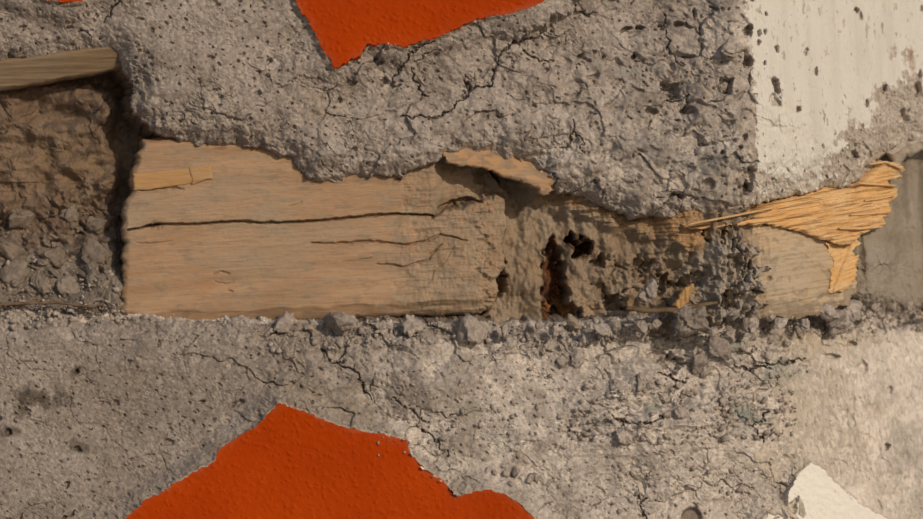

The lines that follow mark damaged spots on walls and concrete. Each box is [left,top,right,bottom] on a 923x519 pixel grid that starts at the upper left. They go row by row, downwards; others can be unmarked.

spalling [0,0,759,220]
crack [390,33,550,120]
crack [559,119,586,152]
peeling [752,70,923,207]
rust [541,233,595,320]
crack [320,349,449,457]
spalling [0,171,923,519]
crack [612,415,670,426]
crack [658,372,687,387]
crack [737,411,770,443]
crack [733,358,806,372]
crack [637,490,647,519]